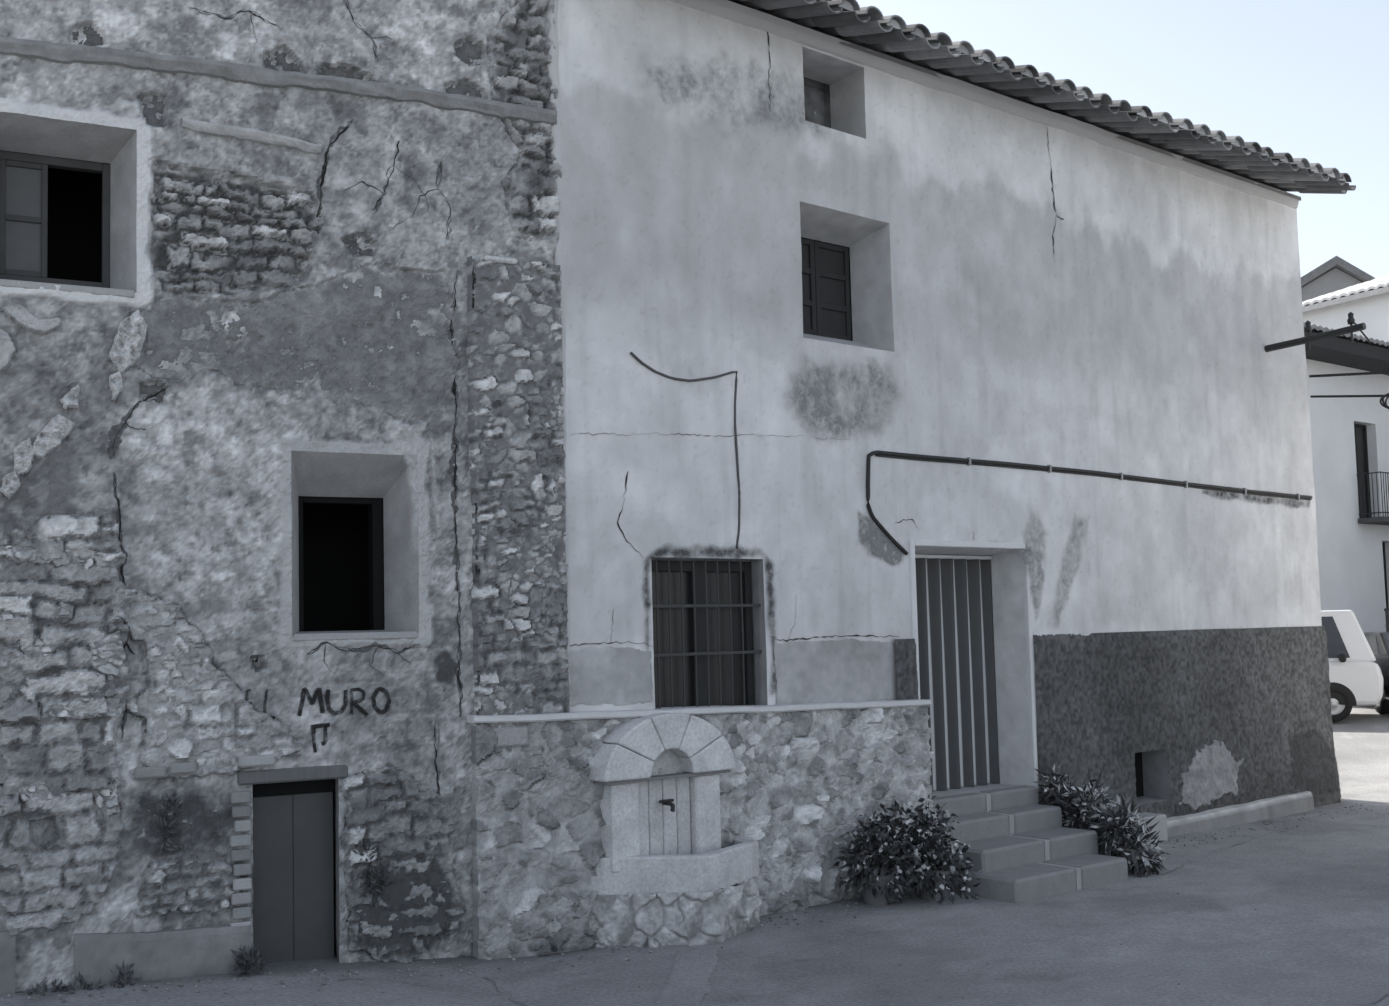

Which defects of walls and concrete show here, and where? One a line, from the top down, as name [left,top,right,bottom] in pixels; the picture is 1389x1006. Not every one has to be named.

crack [1047,130,1064,258]
flaking render [0,304,62,371]
flaking render [134,160,460,423]
crack [307,119,463,795]
water stain [794,366,895,434]
flaking render [0,545,302,779]
flaking render [18,781,53,802]
flaking render [93,784,120,817]
flaking render [135,849,241,920]
flaking render [338,764,466,964]